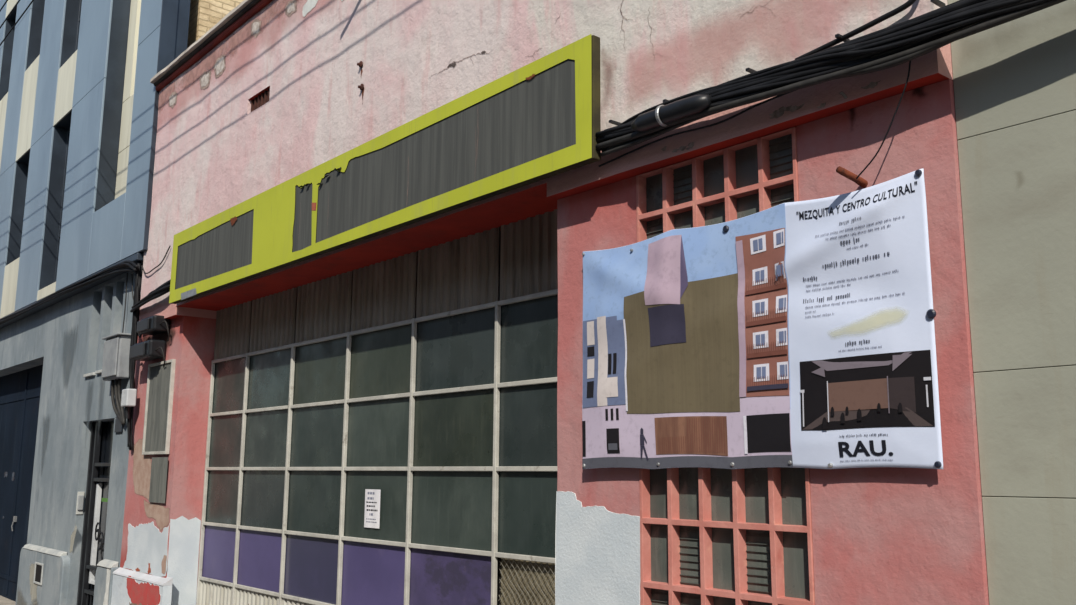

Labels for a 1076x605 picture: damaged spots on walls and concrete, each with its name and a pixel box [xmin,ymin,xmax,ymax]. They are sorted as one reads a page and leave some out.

peeling [285,0,318,17]
crack [617,0,661,57]
peeling [103,439,201,605]
peeling [555,491,640,605]